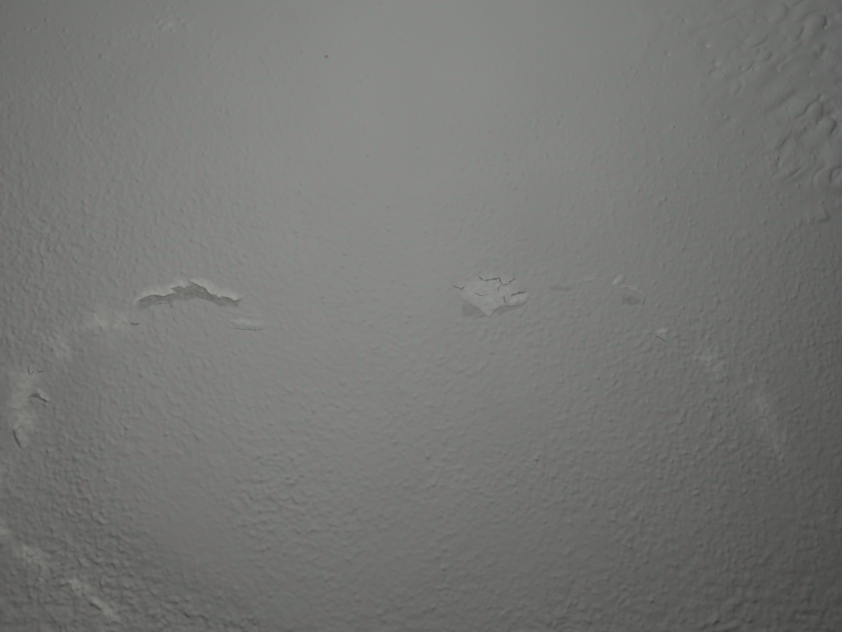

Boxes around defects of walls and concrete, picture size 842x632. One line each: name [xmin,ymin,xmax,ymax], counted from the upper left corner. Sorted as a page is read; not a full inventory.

peeling [132,275,265,330]
peeling [454,270,530,320]